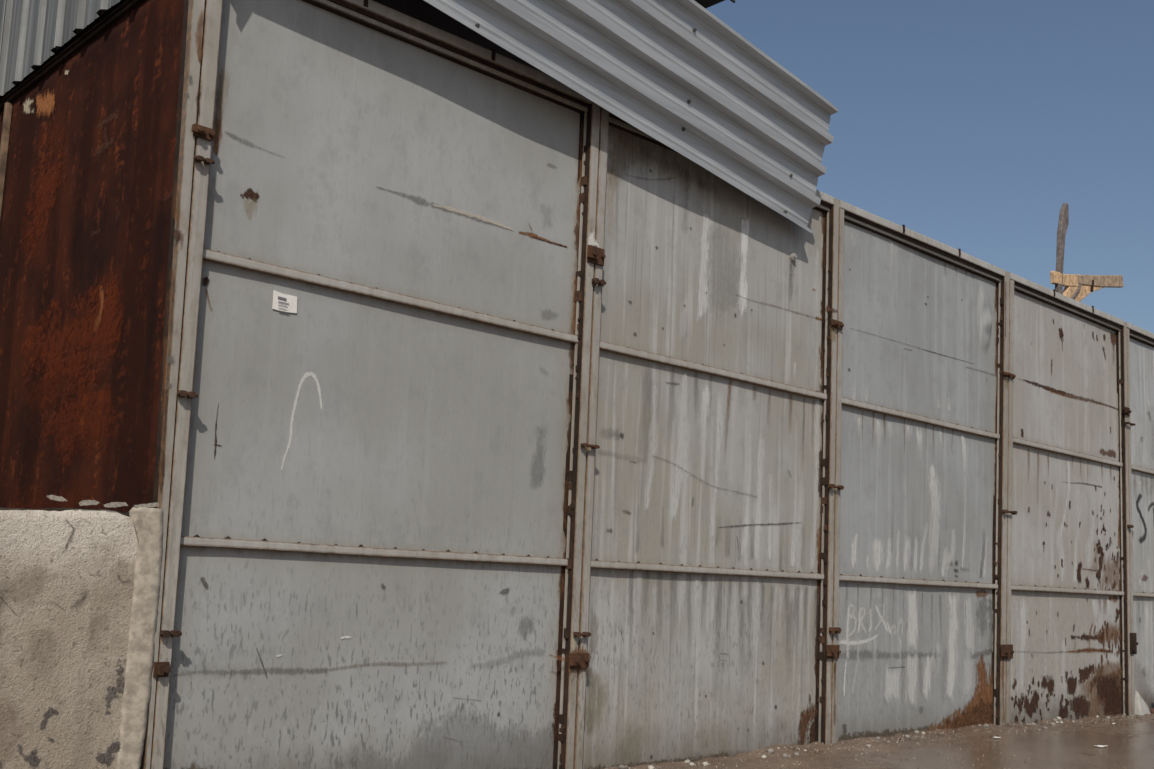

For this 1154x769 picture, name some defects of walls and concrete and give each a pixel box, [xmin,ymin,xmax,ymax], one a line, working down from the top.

peeling [23,94,55,118]
rust [240,188,259,202]
rust [158,355,167,491]
rust [1010,519,1133,723]
rust [928,655,993,731]